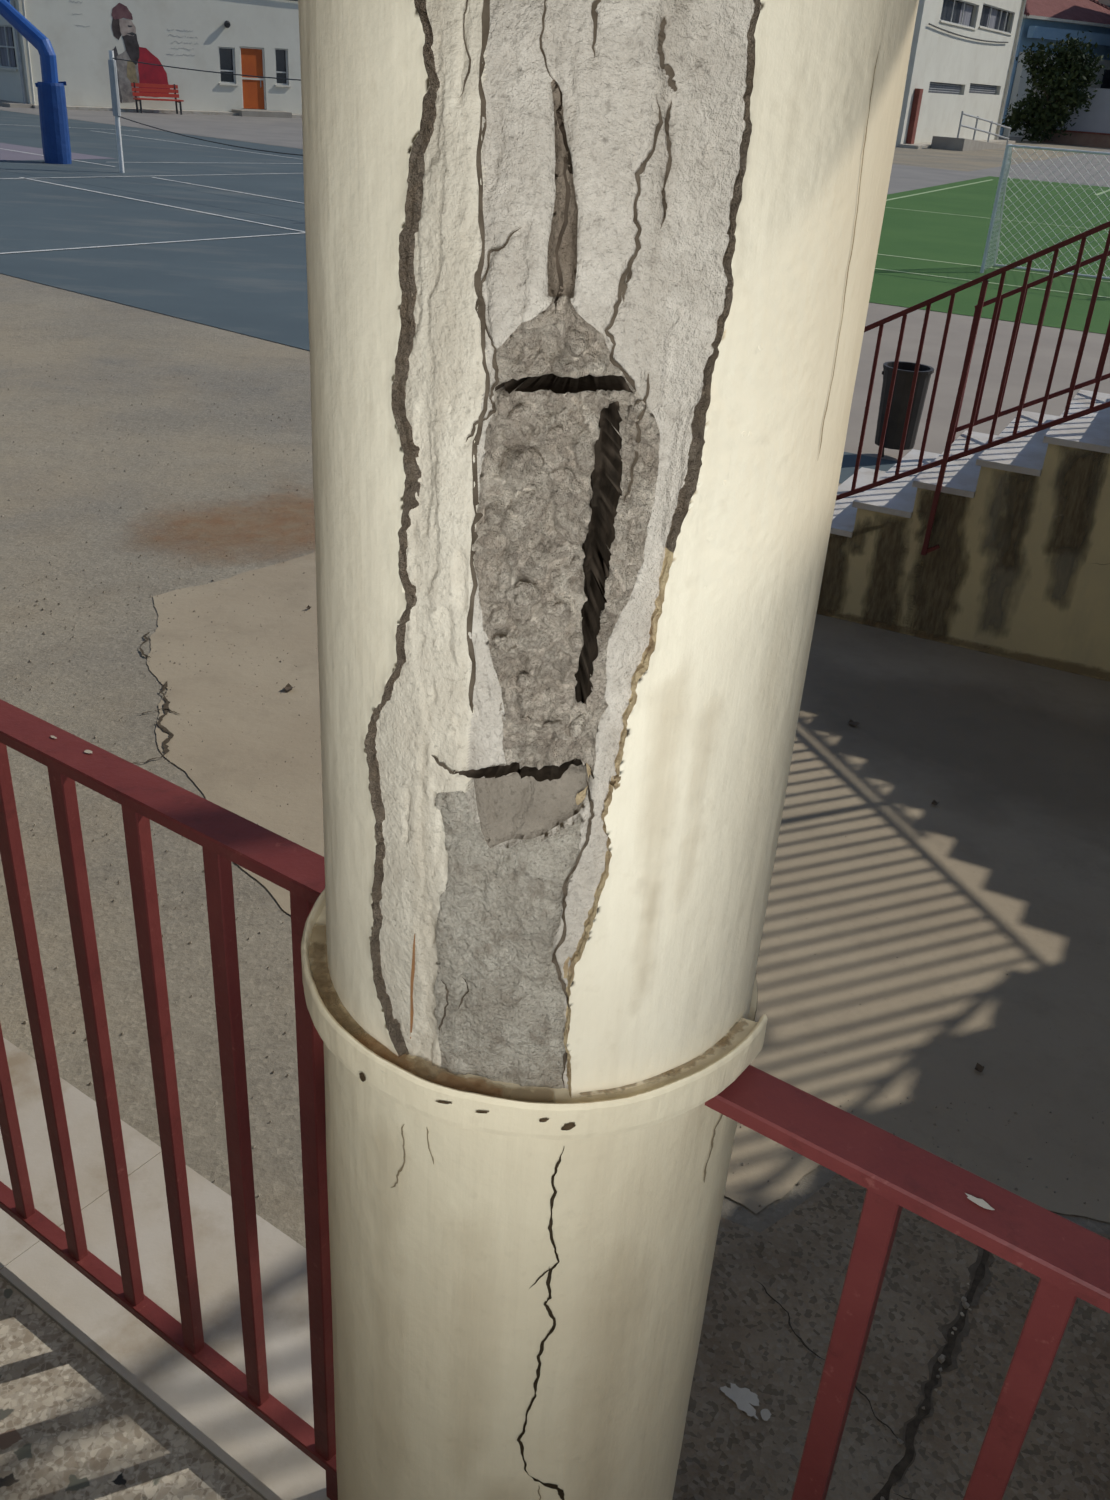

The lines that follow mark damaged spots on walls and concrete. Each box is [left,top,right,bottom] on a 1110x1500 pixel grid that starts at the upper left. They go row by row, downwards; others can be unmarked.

spalling [364,0,761,1097]
leakage [816,492,967,638]
leakage [982,474,1034,632]
leakage [1046,449,1105,603]
crack [139,632,174,755]
crack [517,1149,565,1500]
crack [872,1245,995,1500]